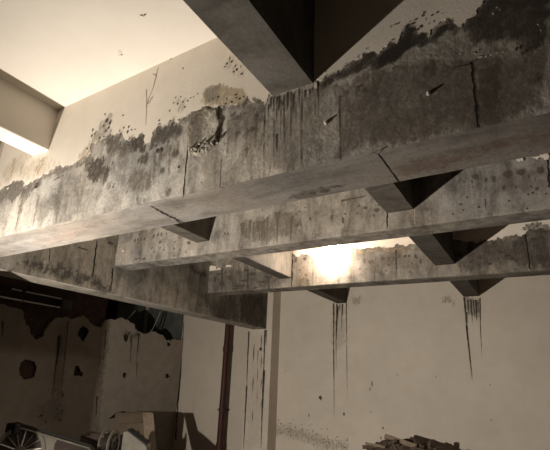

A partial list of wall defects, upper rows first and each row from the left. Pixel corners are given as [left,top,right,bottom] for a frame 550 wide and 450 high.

water stain [460,0,550,61]
spalling [0,99,263,203]
water stain [173,83,246,108]
water stain [263,89,310,150]
crack [452,59,479,128]
crack [151,206,185,223]
hole [19,359,37,379]
water stain [240,276,271,438]
water stain [333,303,347,371]
water stain [463,297,482,375]